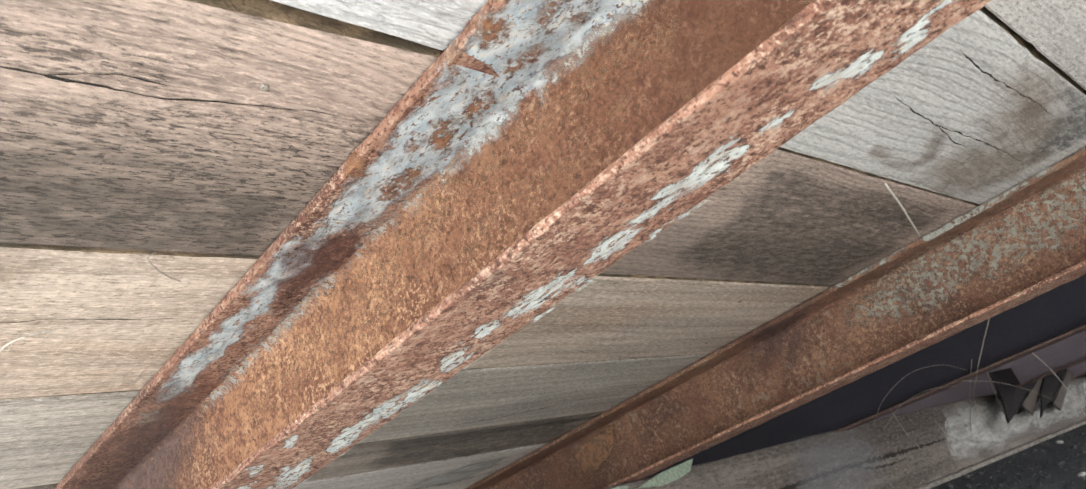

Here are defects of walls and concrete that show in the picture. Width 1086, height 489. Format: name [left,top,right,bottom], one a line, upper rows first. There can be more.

peeling [809,0,958,91]
crack [0,66,344,117]
peeling [759,110,794,136]
crack [896,98,1021,162]
crack [961,50,1055,117]
peeling [139,0,647,424]
corrosion [278,234,358,312]
peeling [237,137,749,489]
corrosion [989,368,1073,423]